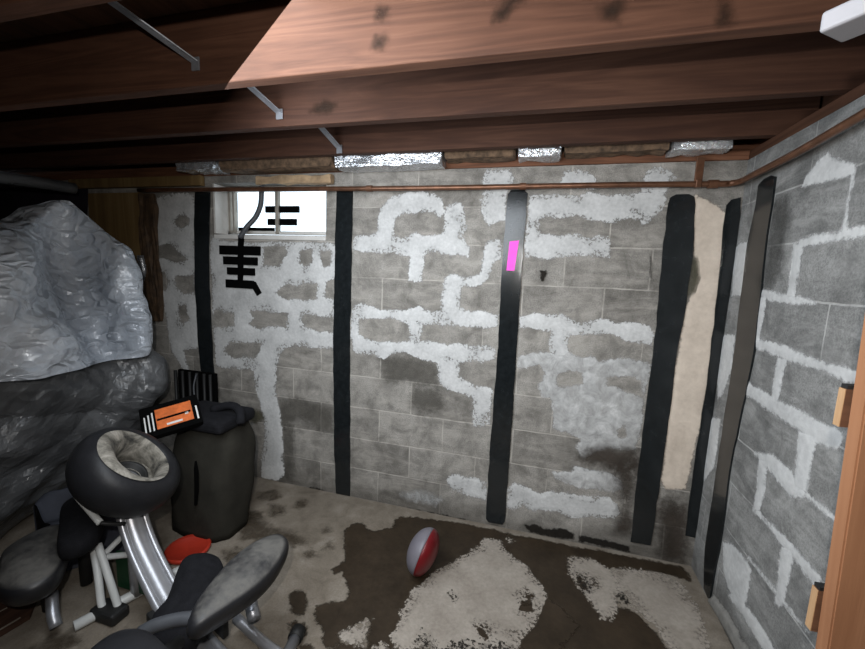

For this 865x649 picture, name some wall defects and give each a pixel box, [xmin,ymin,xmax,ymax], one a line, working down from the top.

damp [687,260,700,295]
damp [580,447,639,534]